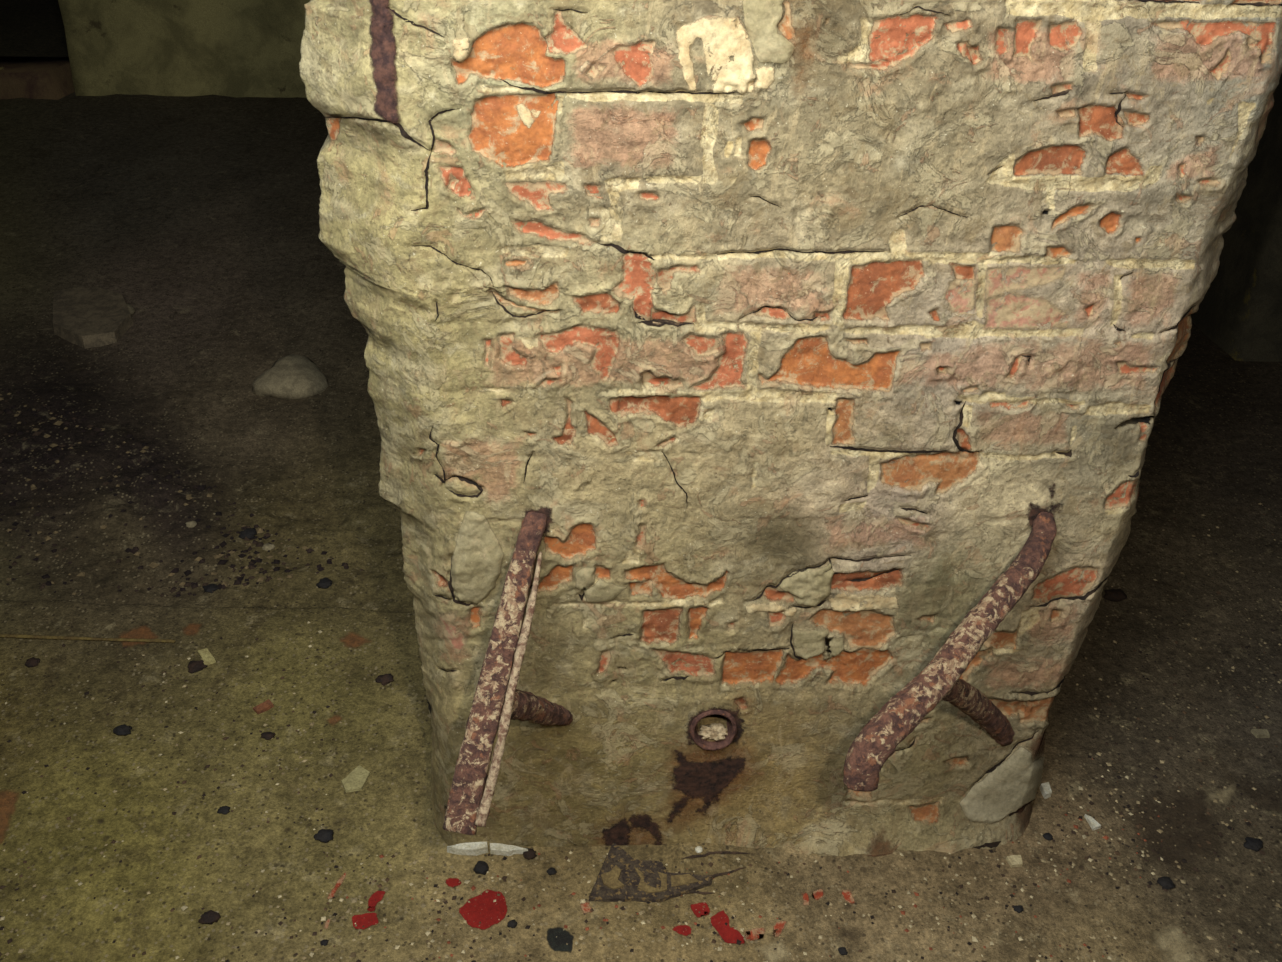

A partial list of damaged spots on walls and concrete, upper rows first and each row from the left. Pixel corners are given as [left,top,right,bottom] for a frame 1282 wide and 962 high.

corrosion [369,0,400,125]
crack [324,108,460,211]
spalling [433,10,603,245]
spalling [1014,93,1150,176]
crack [721,247,884,255]
spalling [813,260,925,321]
spalling [484,253,900,447]
crack [830,401,979,453]
corrosion [525,506,552,539]
spalling [537,523,903,710]
crack [715,555,905,660]
corrosion [602,707,745,846]